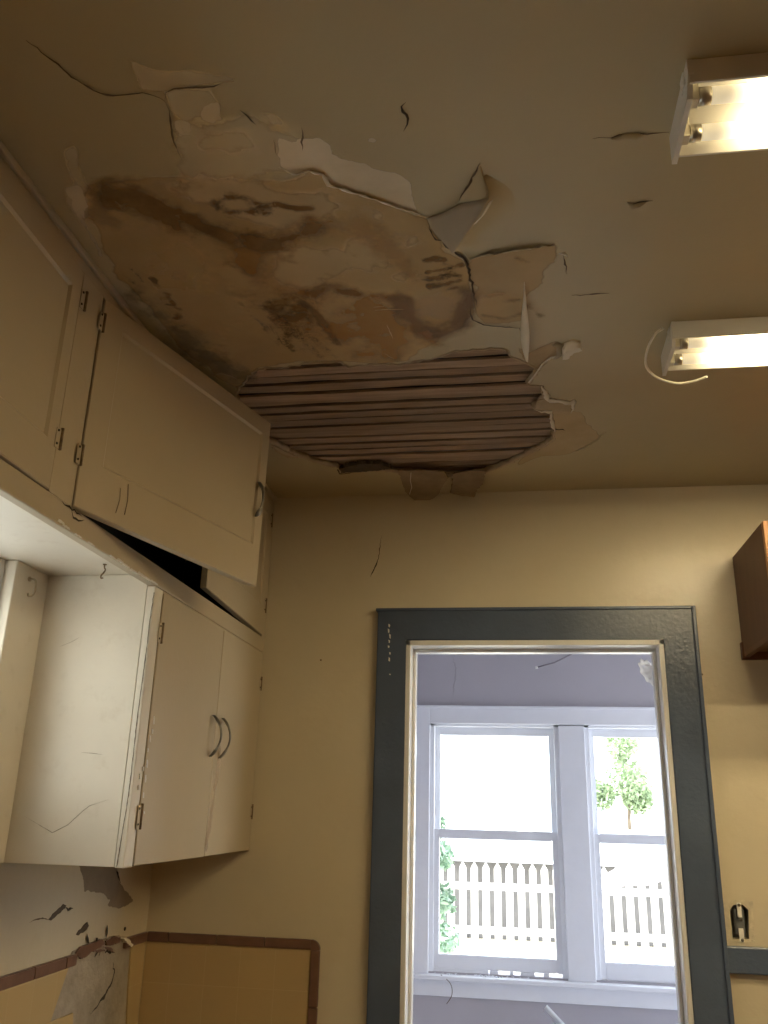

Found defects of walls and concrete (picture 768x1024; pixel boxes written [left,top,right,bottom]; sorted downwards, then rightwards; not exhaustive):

crack [27,41,234,160]
crack [401,102,409,132]
crack [593,132,666,142]
peeling [278,138,420,215]
crack [627,201,648,210]
damp [84,170,476,387]
flaking render [234,245,606,500]
flaking render [31,904,73,922]
peeling [80,866,133,908]
peeling [51,922,133,1024]